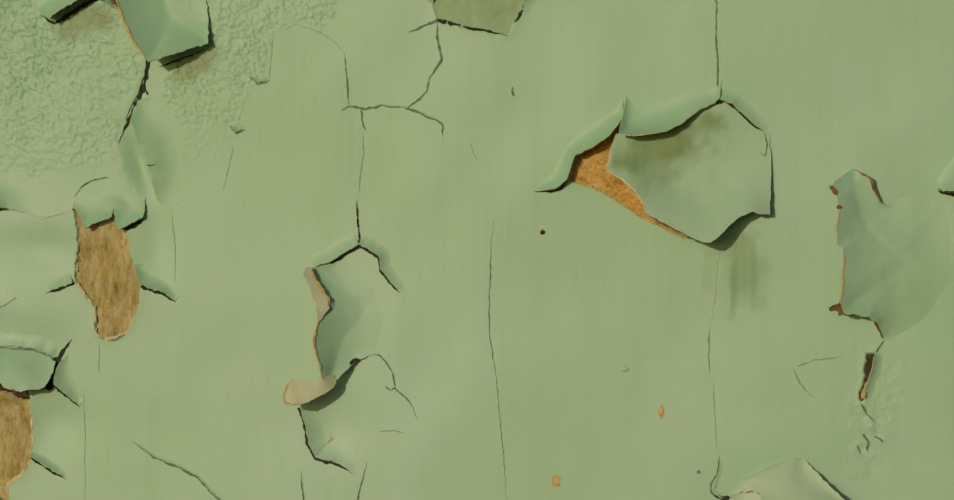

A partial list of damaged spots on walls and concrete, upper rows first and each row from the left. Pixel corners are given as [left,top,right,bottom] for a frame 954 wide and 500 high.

peeling [0,331,84,500]
peeling [45,97,184,341]
peeling [36,0,210,67]
crack [119,58,150,141]
crack [131,440,226,500]
peeling [283,202,403,474]
crack [269,24,444,190]
peeling [408,0,537,36]
crack [488,221,506,493]
peeling [534,80,772,243]
crack [793,357,837,397]
peeling [829,157,954,402]